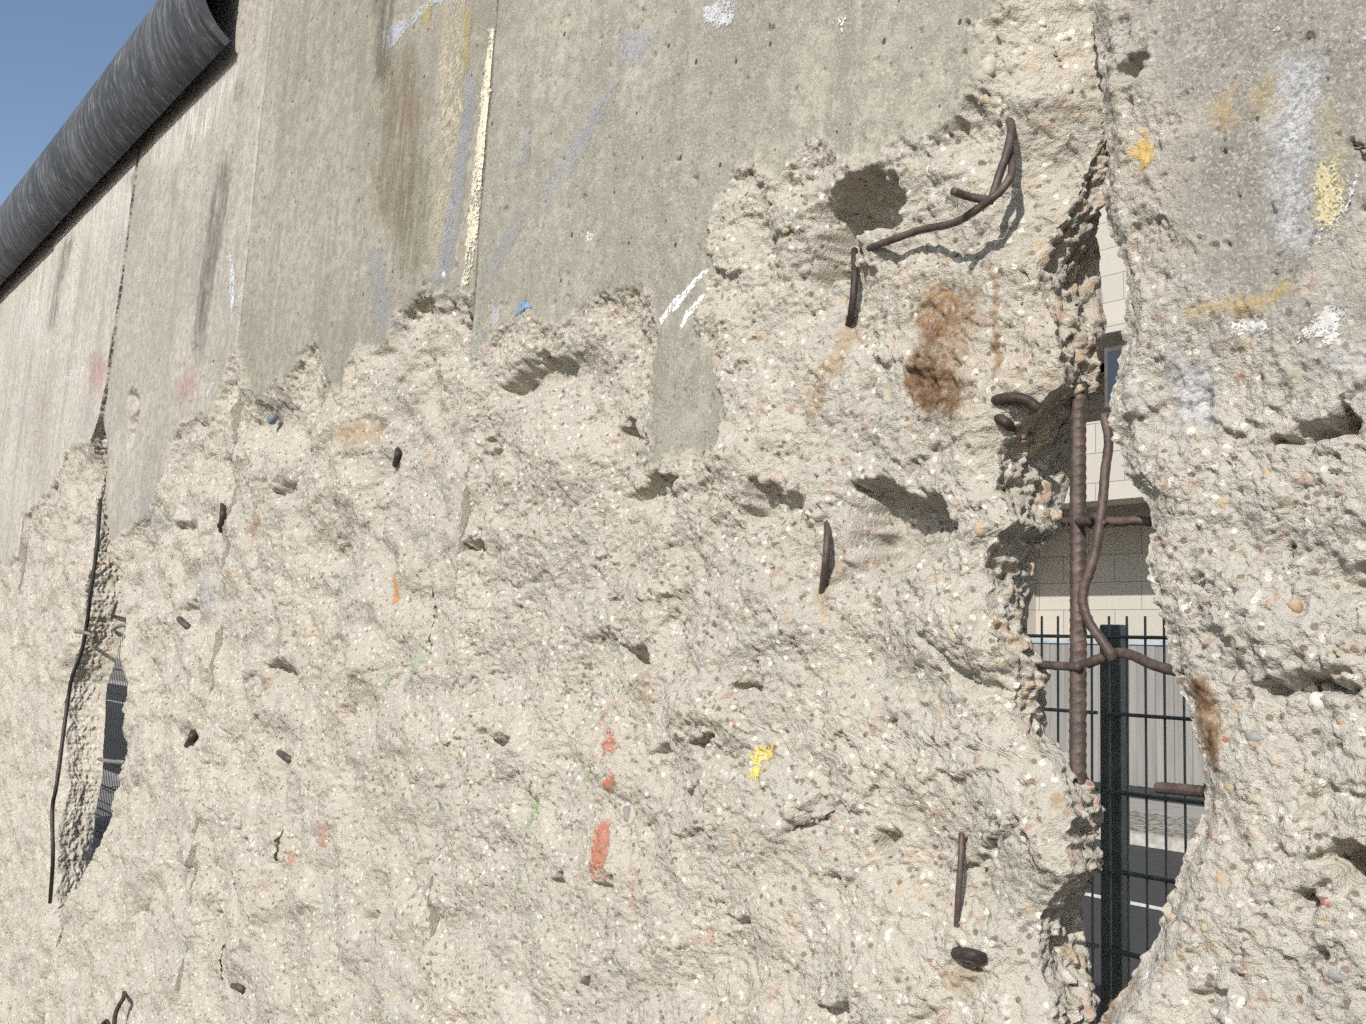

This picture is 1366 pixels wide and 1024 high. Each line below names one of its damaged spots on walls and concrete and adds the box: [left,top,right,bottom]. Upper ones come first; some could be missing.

spalling [0,287,474,1024]
spalling [421,0,1105,1024]
corrosion [906,282,999,411]